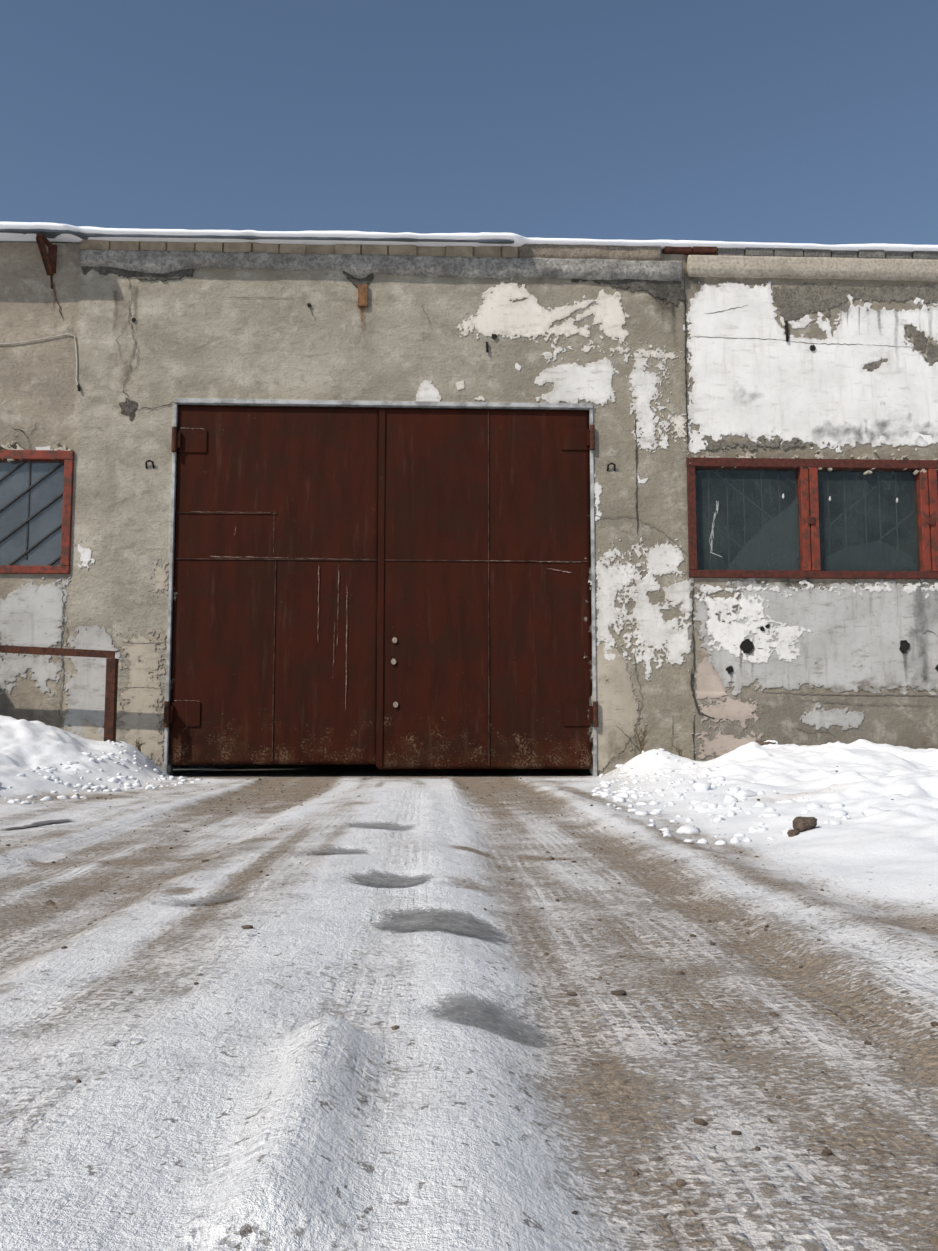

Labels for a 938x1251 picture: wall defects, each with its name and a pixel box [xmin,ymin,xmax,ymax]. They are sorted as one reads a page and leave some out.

crack [116,278,174,413]
peeling [457,277,938,475]
peeling [0,539,169,770]
peeling [584,537,938,772]